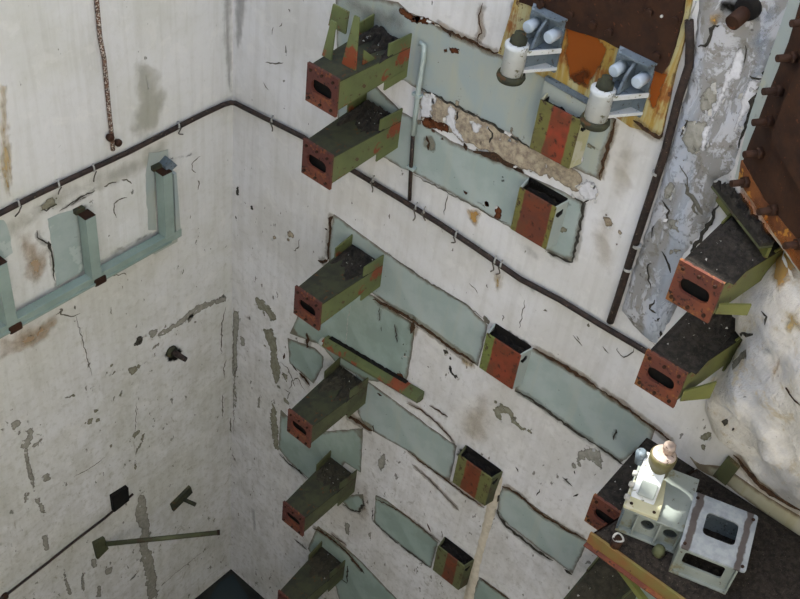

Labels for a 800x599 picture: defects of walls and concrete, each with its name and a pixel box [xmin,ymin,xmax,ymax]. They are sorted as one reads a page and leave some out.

spalling [418,88,599,204]
rust [564,29,607,88]
rust [648,71,675,108]
peeling [681,48,762,161]
crack [37,232,55,280]
spalling [478,201,502,220]
peeling [128,294,226,375]
peeling [231,310,245,407]
peeling [254,297,288,389]
peeling [493,400,532,434]
peeling [1,420,51,516]
spalling [135,487,159,599]